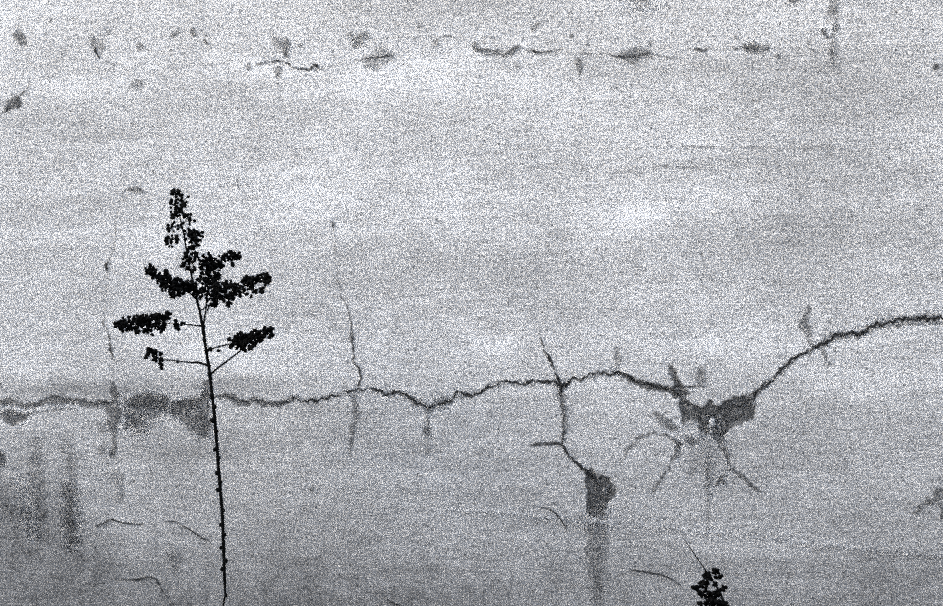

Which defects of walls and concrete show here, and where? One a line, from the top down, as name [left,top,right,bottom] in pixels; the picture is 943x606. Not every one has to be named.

crack [245,37,322,78]
crack [415,24,562,68]
crack [102,319,114,359]
crack [0,394,109,410]
leakage [95,380,212,458]
crack [208,282,943,492]
crack [914,475,943,518]
crack [95,518,209,540]